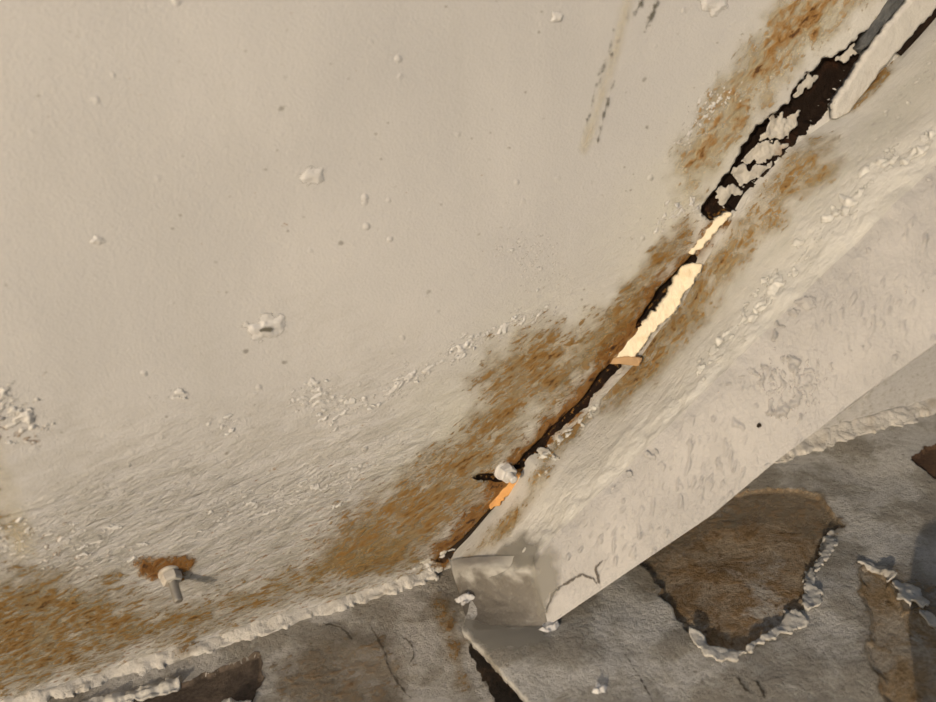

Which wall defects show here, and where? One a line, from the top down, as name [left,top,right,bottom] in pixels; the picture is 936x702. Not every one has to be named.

corrosion [669,0,868,193]
crack [701,31,867,220]
corrosion [849,61,893,112]
crack [897,9,936,56]
crack [636,254,697,329]
corrosion [0,131,845,702]
crack [472,364,621,482]
peeling [911,444,936,479]
peeling [82,651,265,702]
crack [436,507,494,563]
peeling [640,488,845,662]
peeling [857,560,936,702]